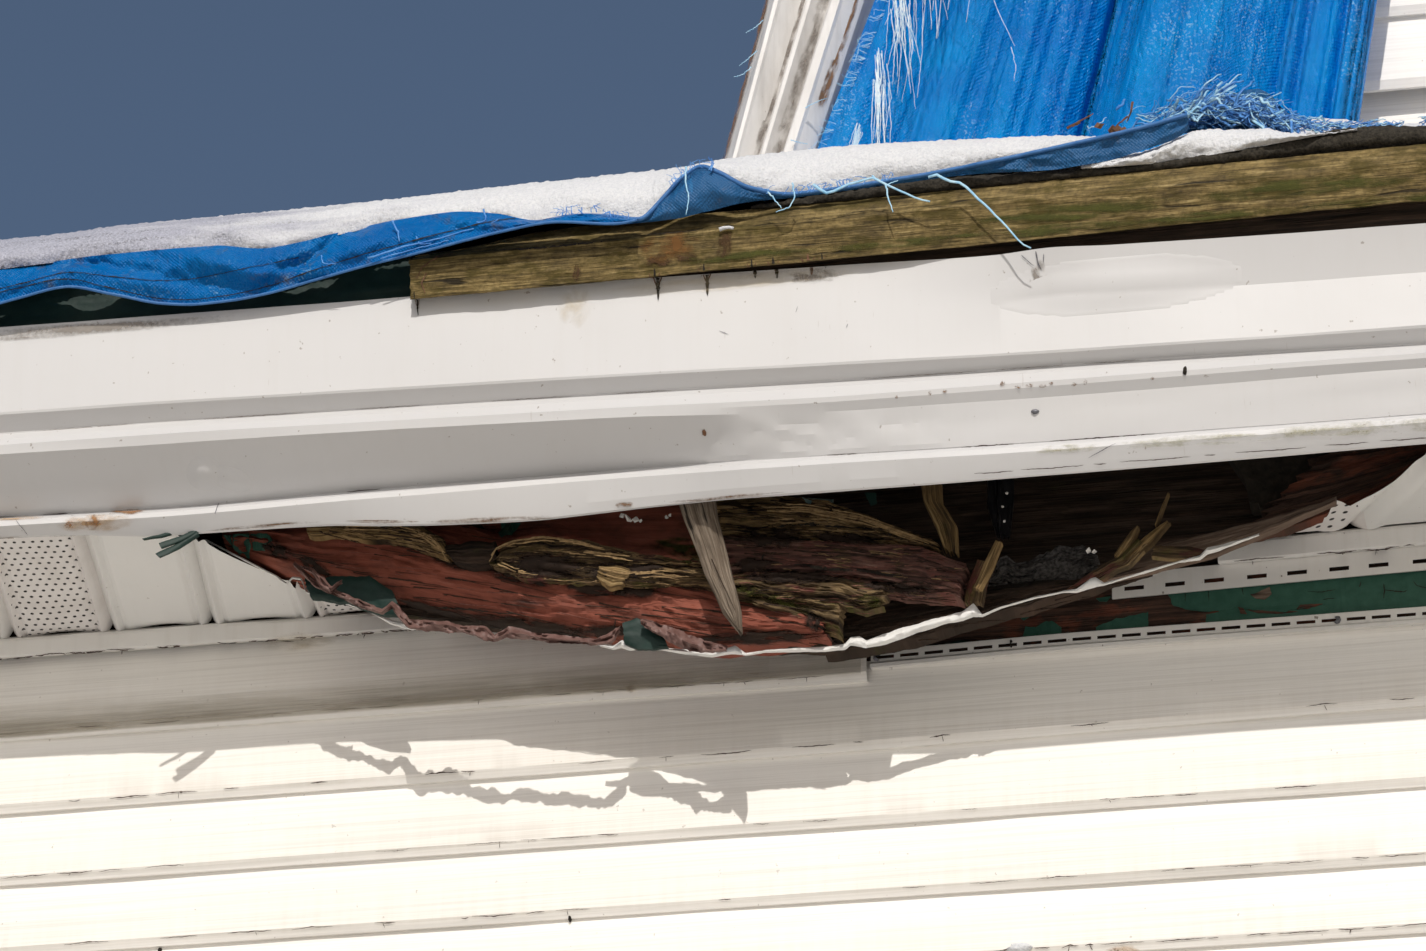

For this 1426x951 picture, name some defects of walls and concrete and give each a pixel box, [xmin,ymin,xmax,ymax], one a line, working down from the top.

peeling [498,523,521,538]
peeling [223,533,272,559]
peeling [1168,570,1426,622]
peeling [1021,617,1061,637]
peeling [1096,612,1149,631]